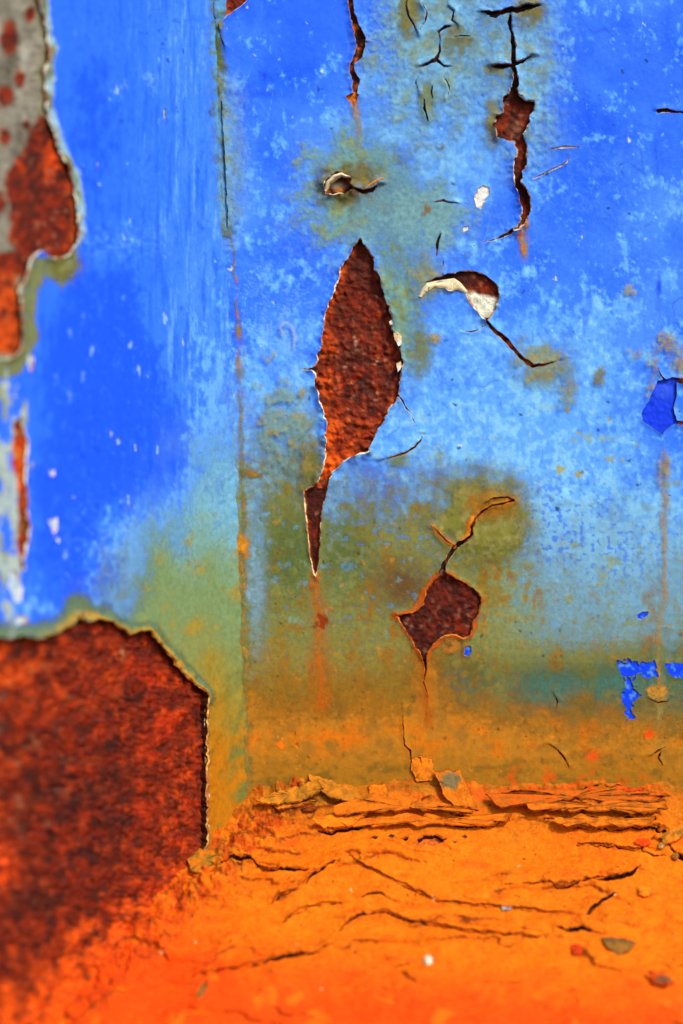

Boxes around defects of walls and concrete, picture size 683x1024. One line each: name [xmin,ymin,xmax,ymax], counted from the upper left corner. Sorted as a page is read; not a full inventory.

peeling [0,0,101,378]
crack [406,0,555,129]
peeling [418,12,546,322]
peeling [298,235,416,577]
rust [636,331,683,376]
peeling [0,410,210,1024]
rust [187,849,220,873]
crack [163,655,683,1003]
peeling [395,569,482,659]
rust [237,397,683,829]
rust [601,937,636,956]
rust [648,969,675,987]